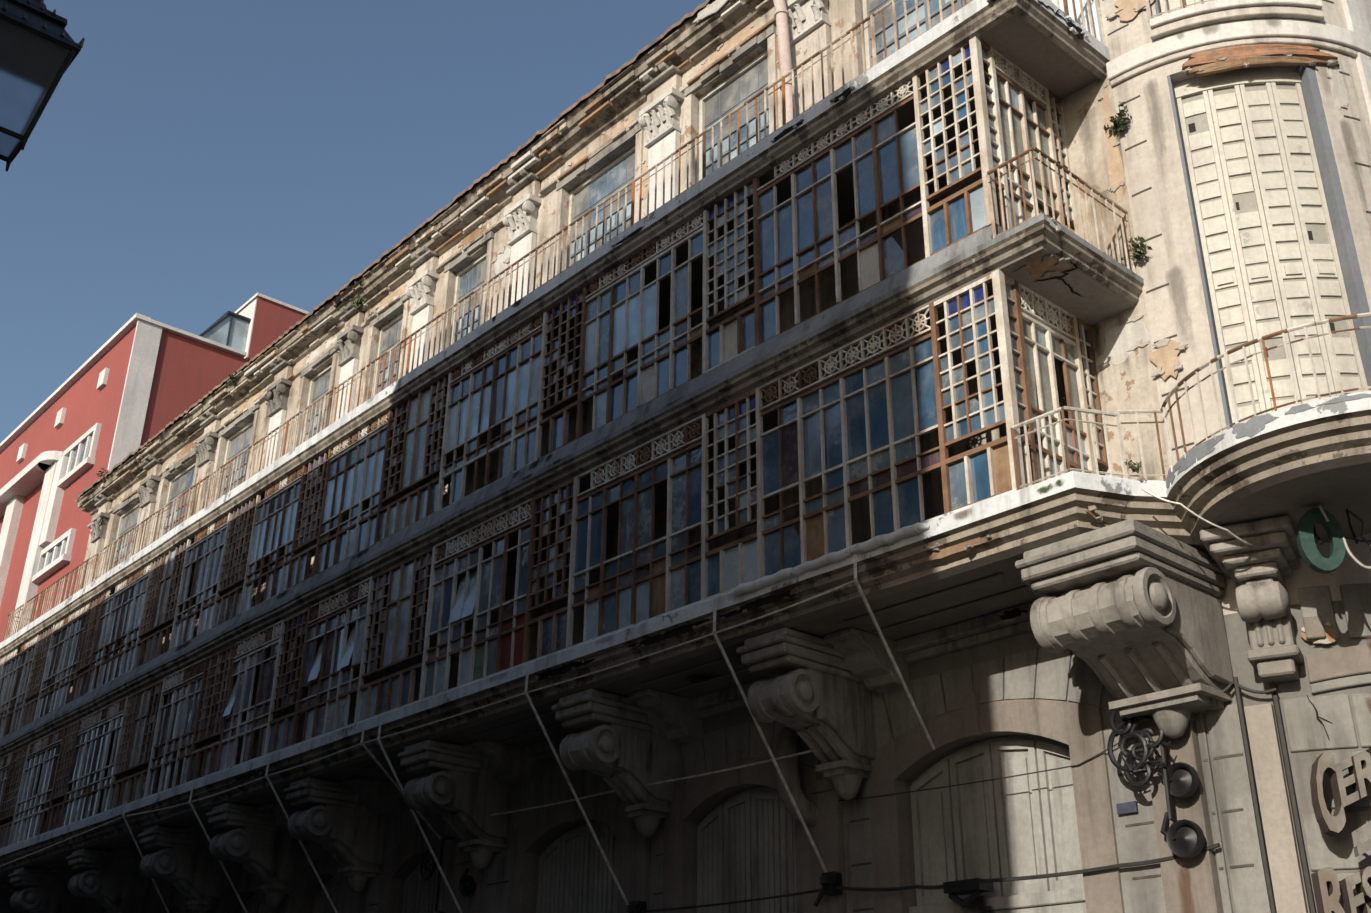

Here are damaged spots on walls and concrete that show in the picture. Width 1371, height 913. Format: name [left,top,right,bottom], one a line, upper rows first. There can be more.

flaking render [1105,0,1154,21]
crack [1035,260,1082,297]
flaking render [1097,314,1188,380]
peeling [1165,392,1371,491]